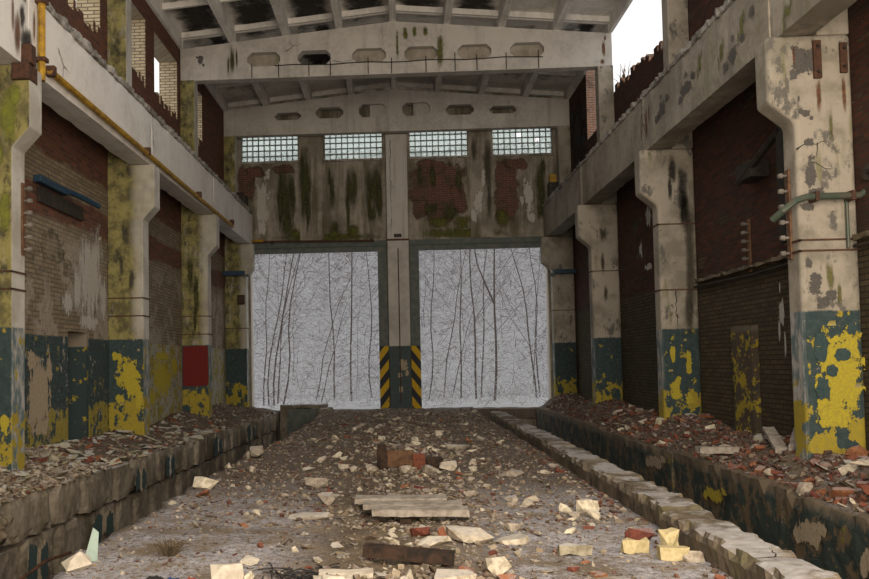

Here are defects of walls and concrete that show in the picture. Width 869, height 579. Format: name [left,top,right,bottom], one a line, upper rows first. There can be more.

damp [277,154,311,237]
damp [331,171,382,236]
spalling [408,158,535,223]
damp [471,140,492,214]
damp [536,161,545,217]
peeling [33,223,107,332]
peeling [26,346,54,437]
peeling [112,349,178,409]
peeling [669,339,694,405]
peeling [814,321,866,429]
peeling [793,517,827,551]
peeling [860,547,869,578]